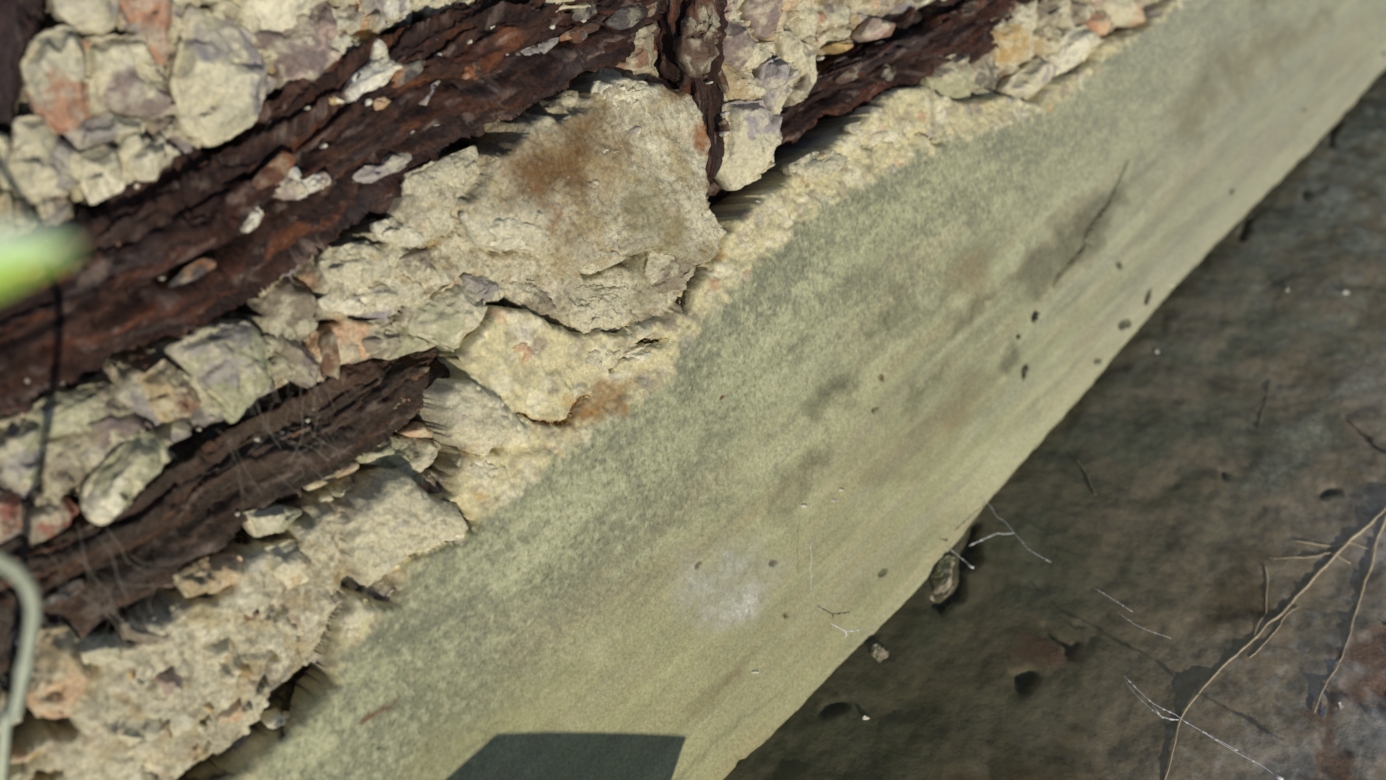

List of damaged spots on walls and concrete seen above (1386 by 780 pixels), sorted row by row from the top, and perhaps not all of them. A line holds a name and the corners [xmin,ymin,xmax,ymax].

corrosion [0,0,732,421]
spalling [0,0,934,546]
corrosion [775,0,1040,150]
spalling [913,0,1160,101]
corrosion [0,346,450,693]
spalling [0,375,522,780]